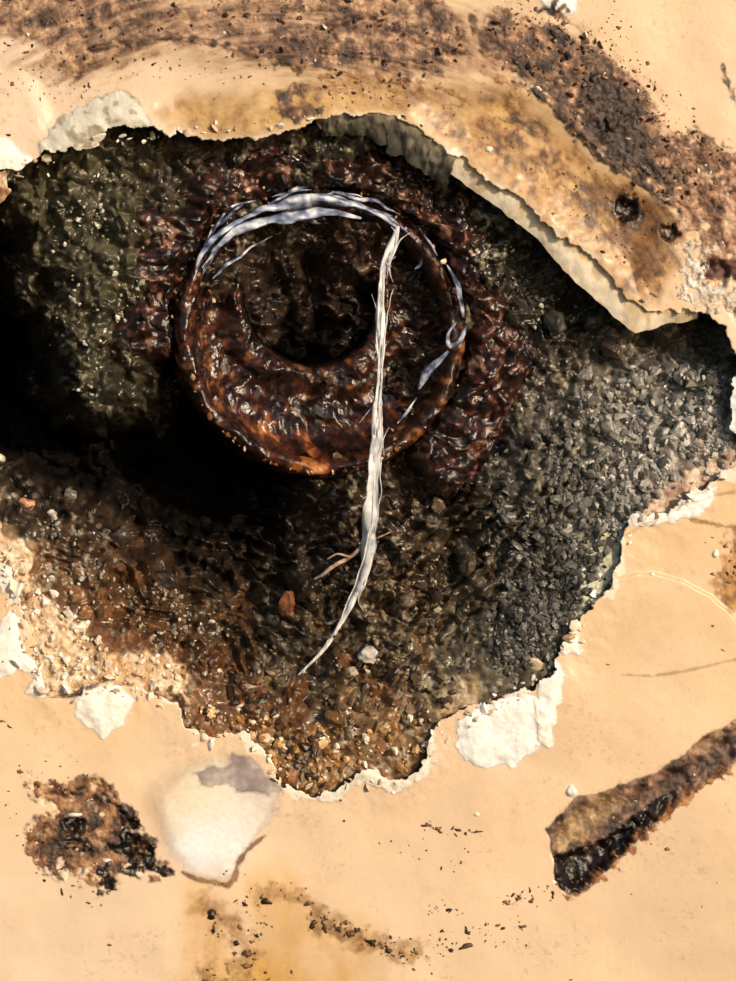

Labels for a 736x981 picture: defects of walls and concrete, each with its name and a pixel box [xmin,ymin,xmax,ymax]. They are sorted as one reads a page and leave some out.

water stain [0,0,736,299]
water stain [397,265,468,423]
corrosion [677,239,736,314]
spalling [0,90,736,802]
spalling [546,720,736,901]